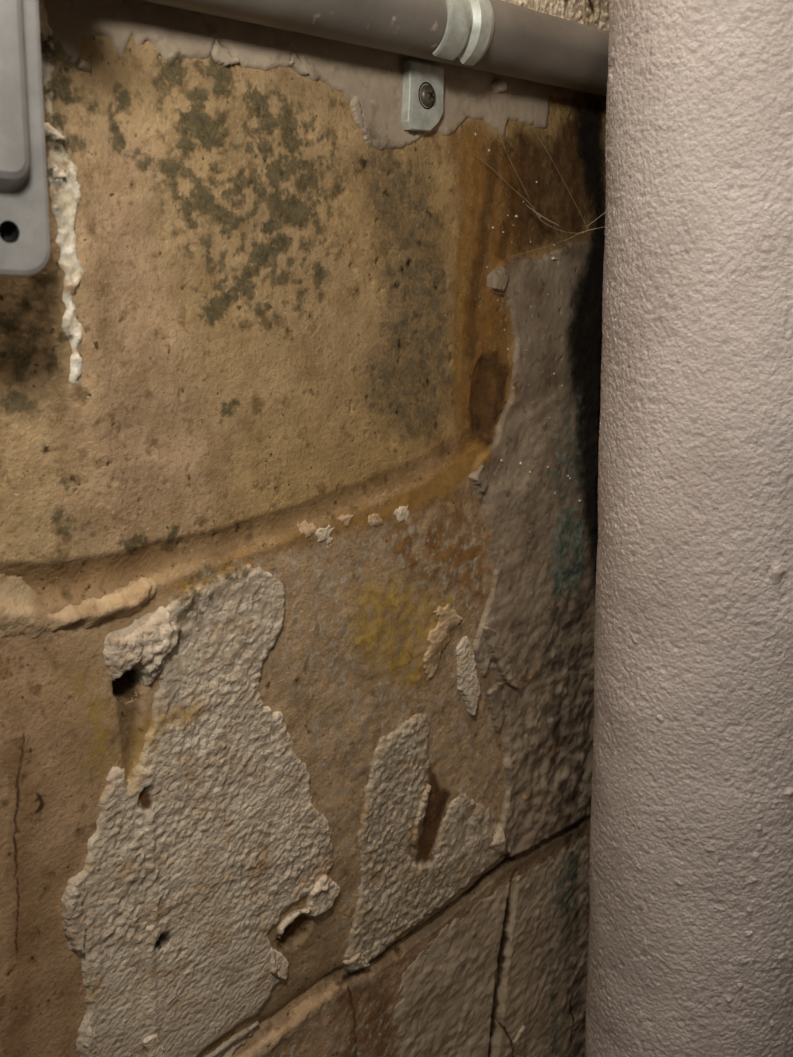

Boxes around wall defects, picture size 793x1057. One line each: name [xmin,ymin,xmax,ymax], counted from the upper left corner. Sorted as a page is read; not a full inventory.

mould [0,271,58,417]
mould [40,33,96,152]
mould [108,51,341,325]
mould [220,399,240,416]
peeling [38,0,574,384]
mould [359,133,451,439]
peeling [422,241,596,857]
flaking render [103,606,179,745]
peeling [417,769,449,861]
spalling [276,915,307,946]
crack [337,832,515,1057]
peeling [393,836,590,1057]